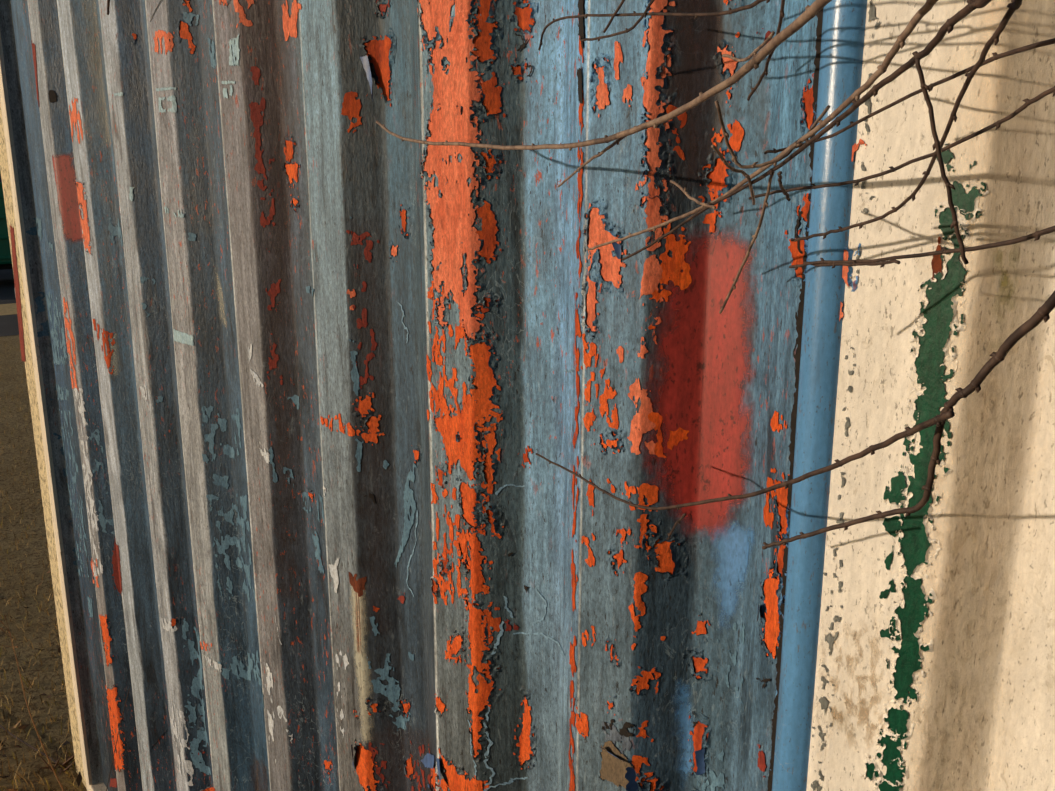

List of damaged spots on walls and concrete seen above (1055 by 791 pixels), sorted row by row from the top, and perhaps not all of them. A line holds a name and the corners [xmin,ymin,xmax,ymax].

peeling [281,0,301,41]
peeling [589,0,692,359]
peeling [698,119,744,236]
peeling [580,197,689,458]
peeling [402,0,538,791]
peeling [607,478,688,650]
peeling [758,468,791,664]
peeling [879,471,906,599]
peeling [105,685,128,788]
peeling [354,738,390,791]
peeling [575,664,664,742]
peeling [859,700,915,791]